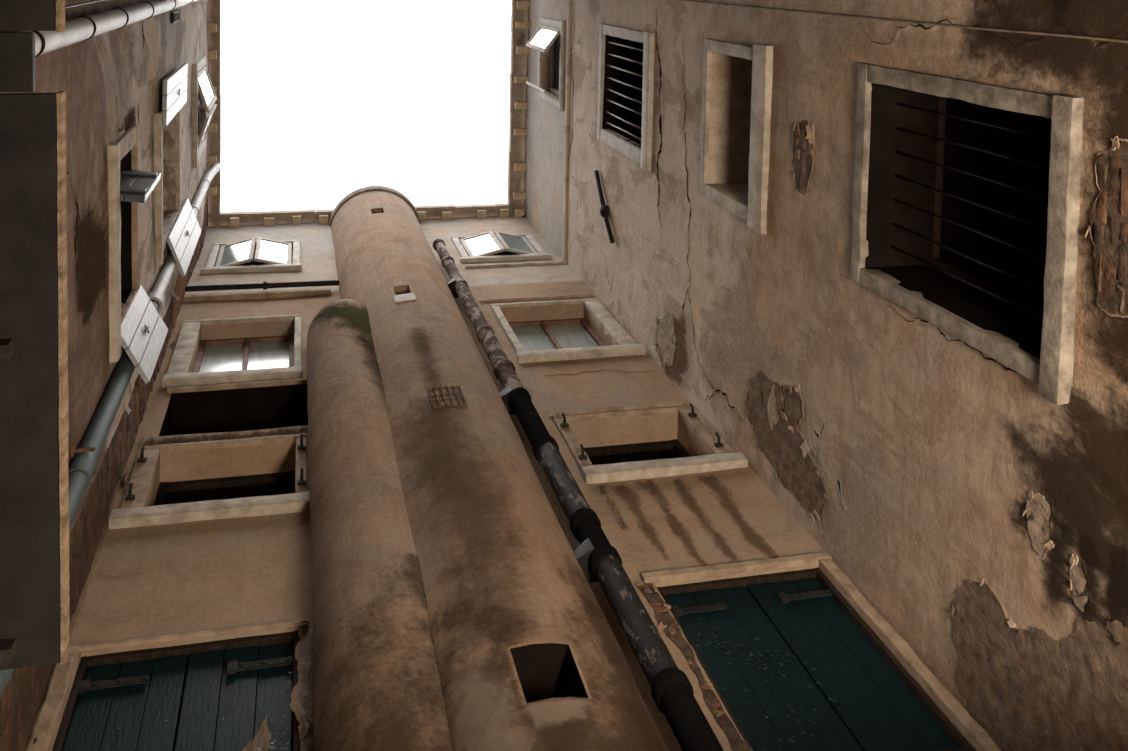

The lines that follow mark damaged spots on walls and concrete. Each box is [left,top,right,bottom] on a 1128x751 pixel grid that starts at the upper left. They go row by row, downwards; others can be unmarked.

water stain [961,0,1128,148]
crack [66,168,82,268]
crack [655,9,743,422]
flaking render [1084,136,1128,318]
flaking render [69,195,209,620]
water stain [599,480,707,566]
water stain [700,475,780,558]
spalling [742,368,827,522]
spalling [1023,489,1055,561]
water stain [1008,390,1128,646]
water stain [308,569,668,751]
spalling [951,554,1128,751]